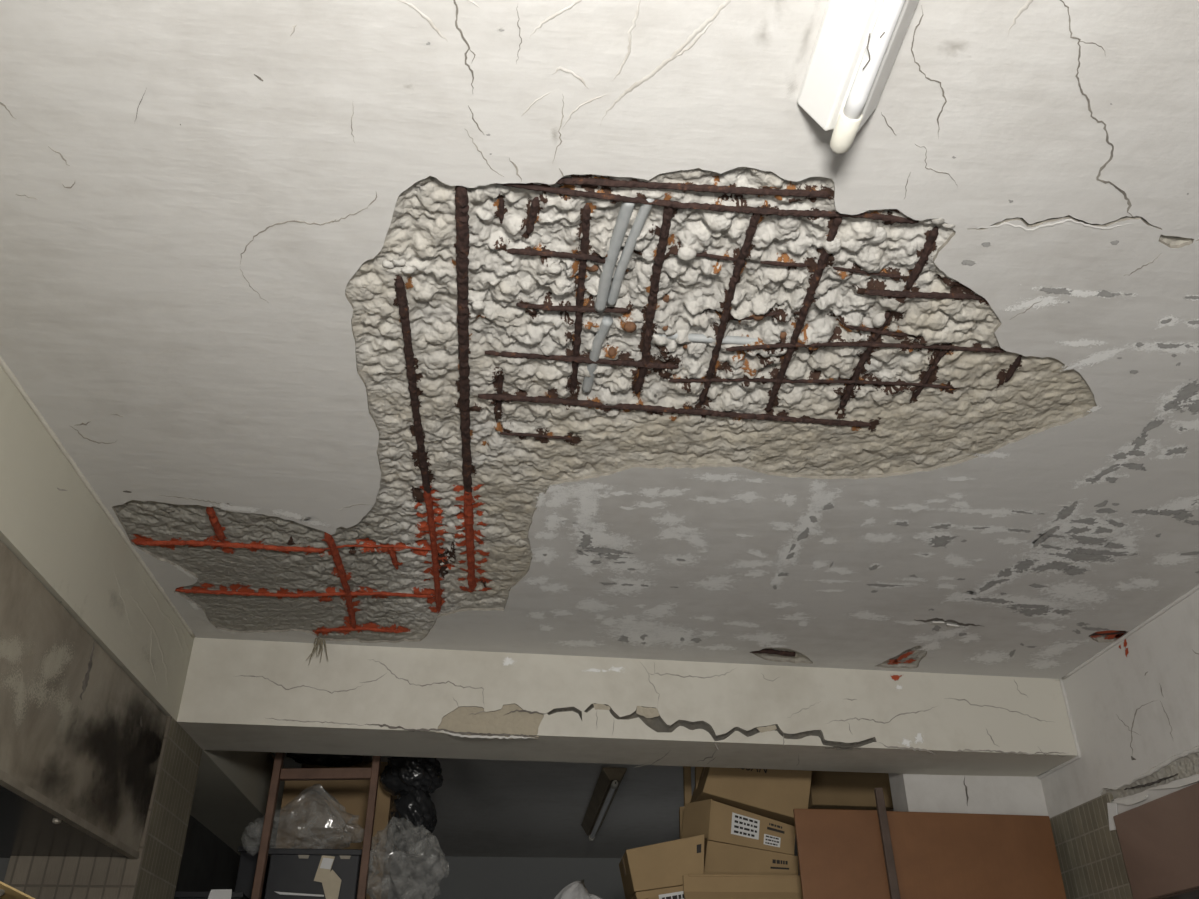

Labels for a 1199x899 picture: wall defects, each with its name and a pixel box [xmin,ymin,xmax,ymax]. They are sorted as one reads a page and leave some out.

crack [453,0,522,181]
crack [553,97,564,177]
crack [881,5,958,199]
crack [969,0,1192,276]
spalling [114,167,1199,681]
water stain [0,633,158,823]
crack [547,664,1066,806]